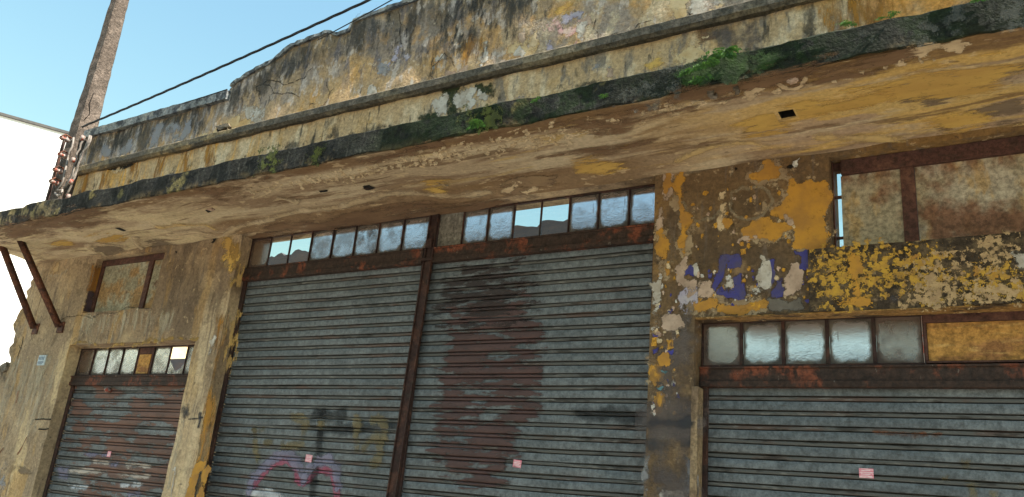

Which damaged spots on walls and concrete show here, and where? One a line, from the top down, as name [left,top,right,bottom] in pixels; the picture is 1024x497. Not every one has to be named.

water stain [418,82,496,120]
water stain [79,108,209,166]
water stain [359,141,445,167]
peeling [249,116,628,199]
peeling [645,158,1024,416]